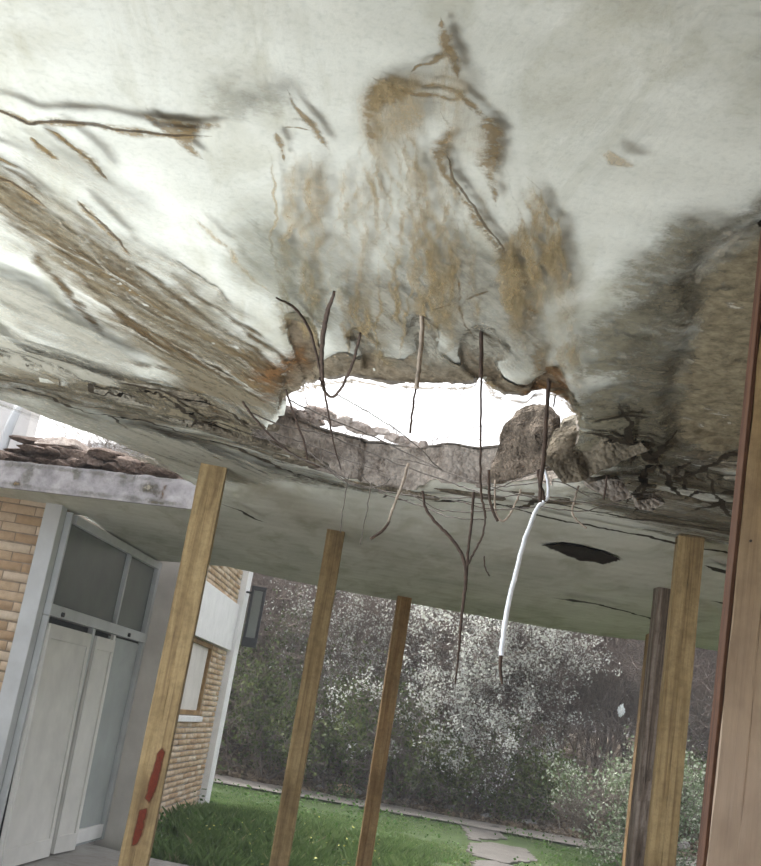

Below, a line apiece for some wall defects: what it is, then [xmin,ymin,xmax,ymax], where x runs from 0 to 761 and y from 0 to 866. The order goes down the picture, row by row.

crack [0,110,208,179]
crack [78,201,131,256]
water stain [0,168,288,445]
water stain [40,402,388,494]
rust [275,93,327,160]
spalling [87,291,587,684]
crack [1,350,738,574]
rust [363,19,503,201]
spalling [543,542,620,564]
water stain [569,220,735,495]
spalling [628,220,761,510]